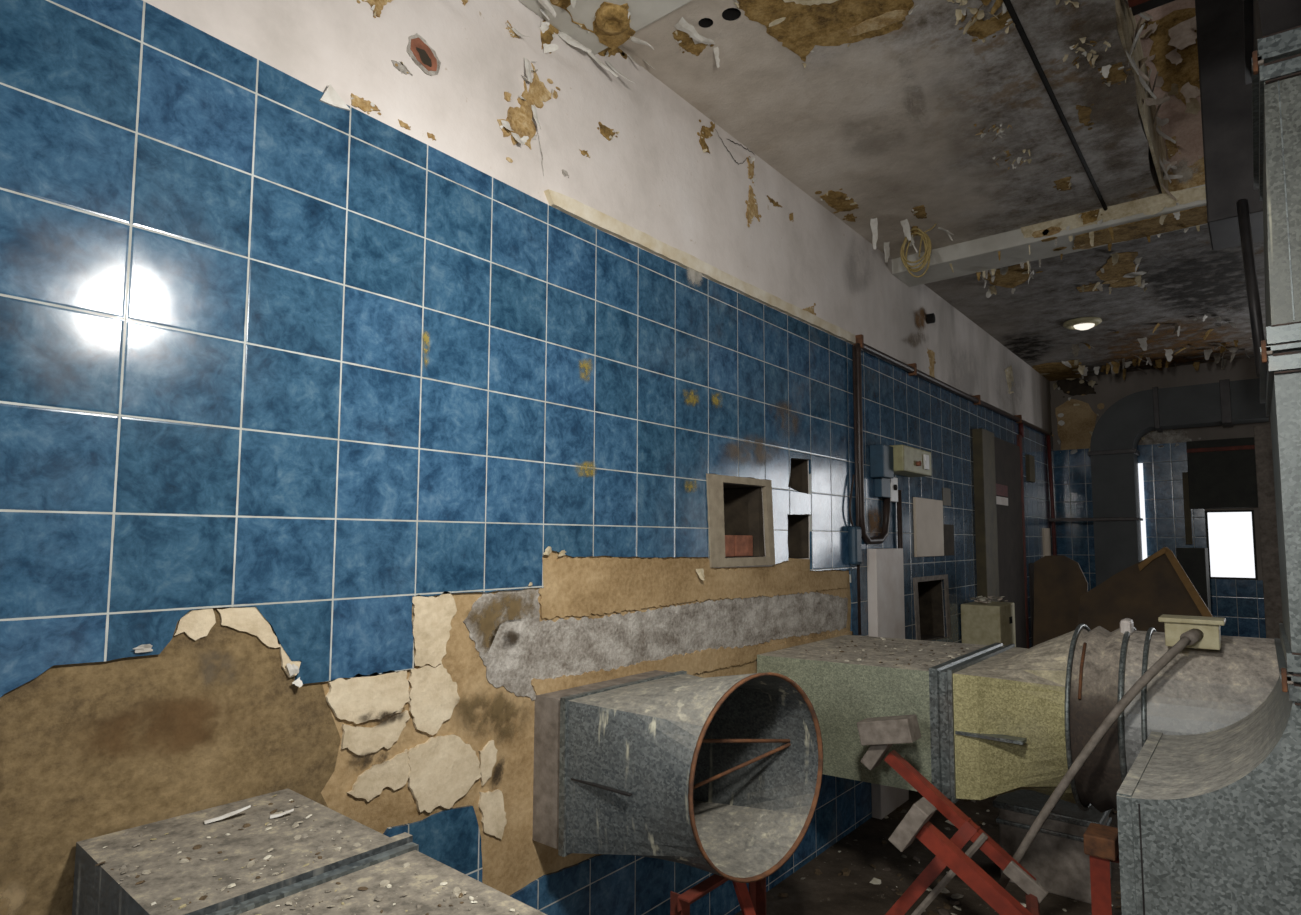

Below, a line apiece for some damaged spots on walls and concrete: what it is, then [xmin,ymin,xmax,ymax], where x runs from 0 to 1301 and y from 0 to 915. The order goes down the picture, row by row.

peeling [319,84,381,115]
peeling [356,0,392,18]
spalling [391,33,441,76]
peeling [497,0,656,163]
peeling [672,17,720,68]
flaking render [734,0,918,68]
peeling [697,119,715,154]
peeling [974,0,1208,298]
peeling [745,156,794,227]
peeling [815,189,890,262]
flaking render [1032,315,1252,454]
peeling [0,546,853,915]